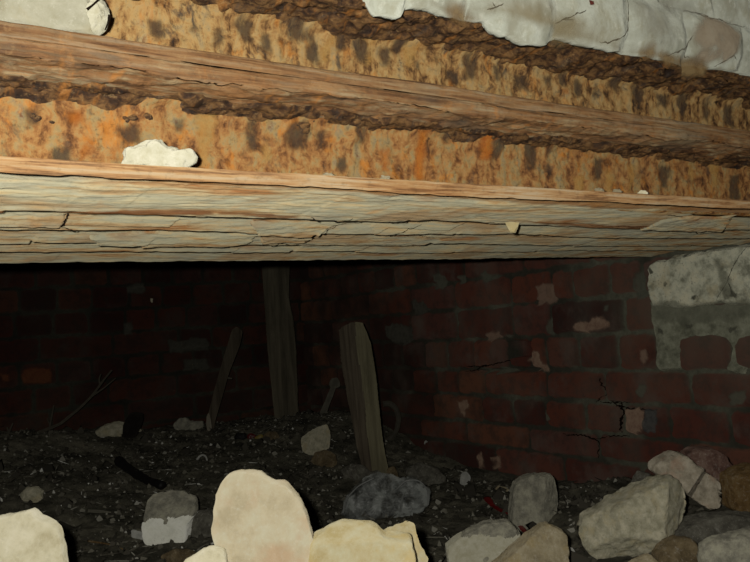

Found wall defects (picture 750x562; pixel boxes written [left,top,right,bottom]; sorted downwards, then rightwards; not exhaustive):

corrosion [149,21,163,37]
corrosion [236,18,252,41]
corrosion [271,11,317,61]
corrosion [353,38,367,61]
corrosion [381,39,407,64]
corrosion [447,56,476,82]
corrosion [0,73,750,234]
crack [270,217,360,246]
spalling [536,283,558,305]
spalling [573,317,609,333]
crack [563,378,653,458]
spalling [625,408,657,435]